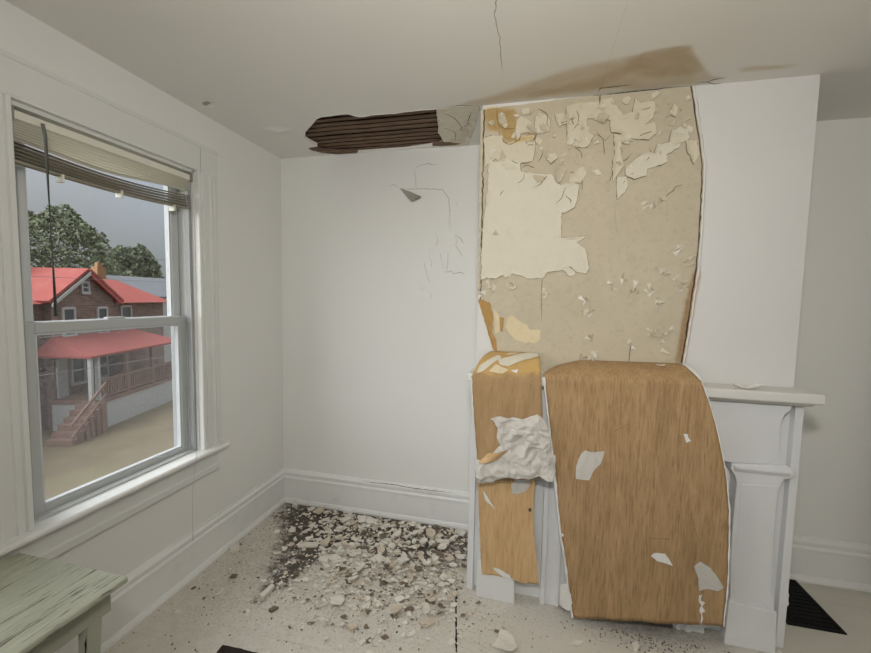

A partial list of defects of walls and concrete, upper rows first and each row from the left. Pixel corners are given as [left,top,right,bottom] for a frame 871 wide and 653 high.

crack [494,0,503,70]
spalling [304,109,444,155]
peeling [478,86,704,375]